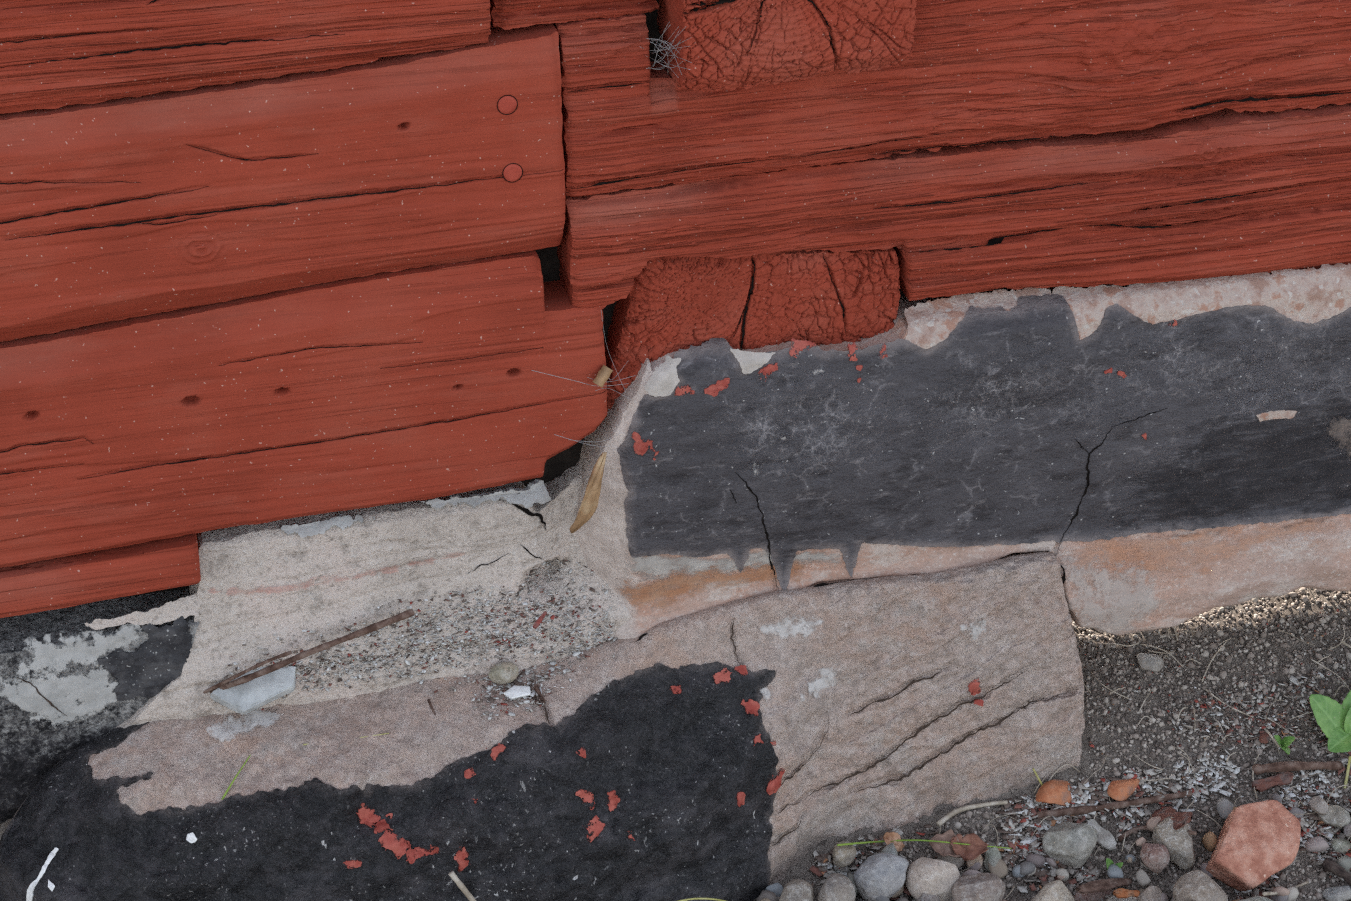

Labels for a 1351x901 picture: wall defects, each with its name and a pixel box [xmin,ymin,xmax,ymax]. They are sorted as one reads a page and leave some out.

crack [684,0,765,56]
crack [807,0,837,70]
crack [733,257,755,350]
crack [823,256,846,333]
peeling [904,263,1351,349]
peeling [645,356,681,397]
peeling [730,348,775,374]
peeling [1256,410,1297,422]
peeling [420,479,553,510]
crack [730,472,779,590]
crack [1055,408,1167,584]
peeling [0,594,201,726]